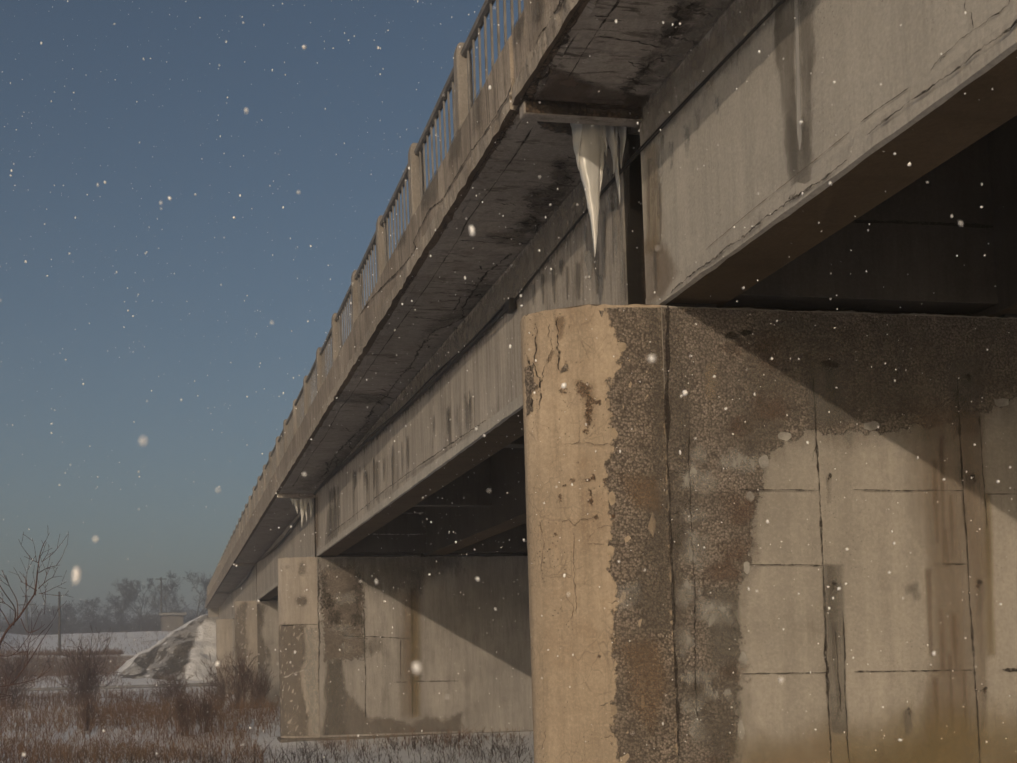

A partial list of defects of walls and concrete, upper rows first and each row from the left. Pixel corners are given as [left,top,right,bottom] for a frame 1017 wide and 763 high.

crack [569,1,699,91]
water stain [533,0,773,142]
water stain [794,0,802,150]
crack [353,81,513,325]
crack [292,130,579,487]
water stain [324,127,631,531]
peeling [524,317,568,416]
crack [664,0,1017,763]
crack [329,420,486,535]
spalling [558,307,1017,763]
water stain [235,603,461,736]
water stain [824,621,1004,763]